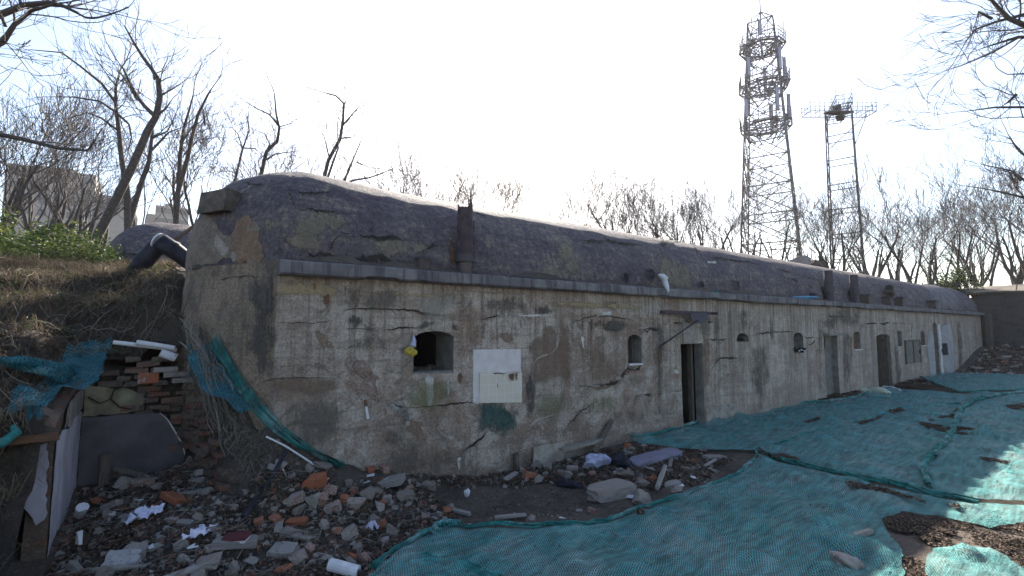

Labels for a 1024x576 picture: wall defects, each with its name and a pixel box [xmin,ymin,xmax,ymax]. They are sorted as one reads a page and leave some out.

peeling [185,214,264,270]
crack [240,182,450,265]
crack [275,307,451,330]
crack [395,400,477,408]
leakage [480,403,516,437]
crack [559,366,679,438]